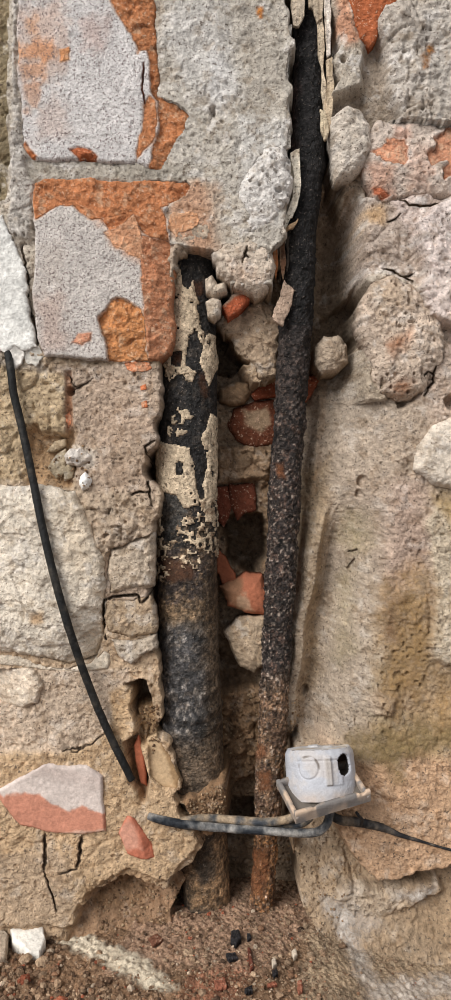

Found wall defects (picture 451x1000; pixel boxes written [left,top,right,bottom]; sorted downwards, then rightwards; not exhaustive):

spalling [33,0,219,386]
crack [387,200,438,222]
crack [383,268,414,282]
crack [131,440,156,506]
flaking render [155,407,219,583]
corrosion [158,557,193,581]
crack [102,581,158,640]
crack [43,834,82,912]
corrosion [251,850,268,897]